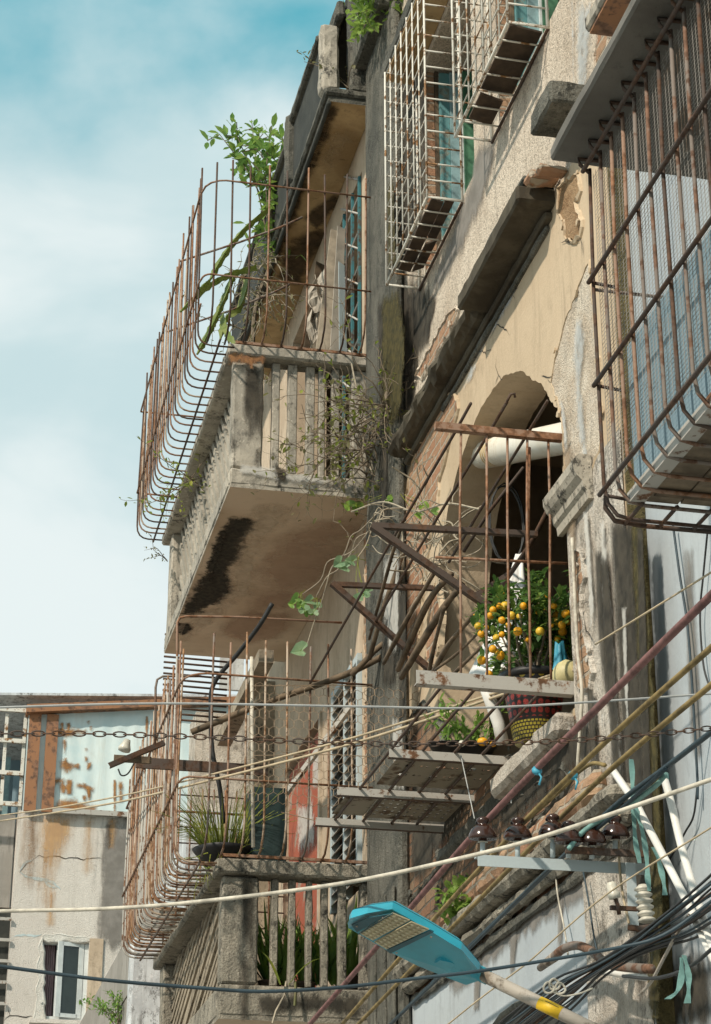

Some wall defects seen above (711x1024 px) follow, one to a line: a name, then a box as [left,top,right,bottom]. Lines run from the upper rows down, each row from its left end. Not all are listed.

water stain [249,106,338,335]
flaking render [553,170,585,245]
spalling [414,305,461,383]
water stain [175,516,257,635]
flaking render [405,392,460,667]
rust [23,713,95,877]
rust [109,780,122,844]
crack [19,855,92,889]